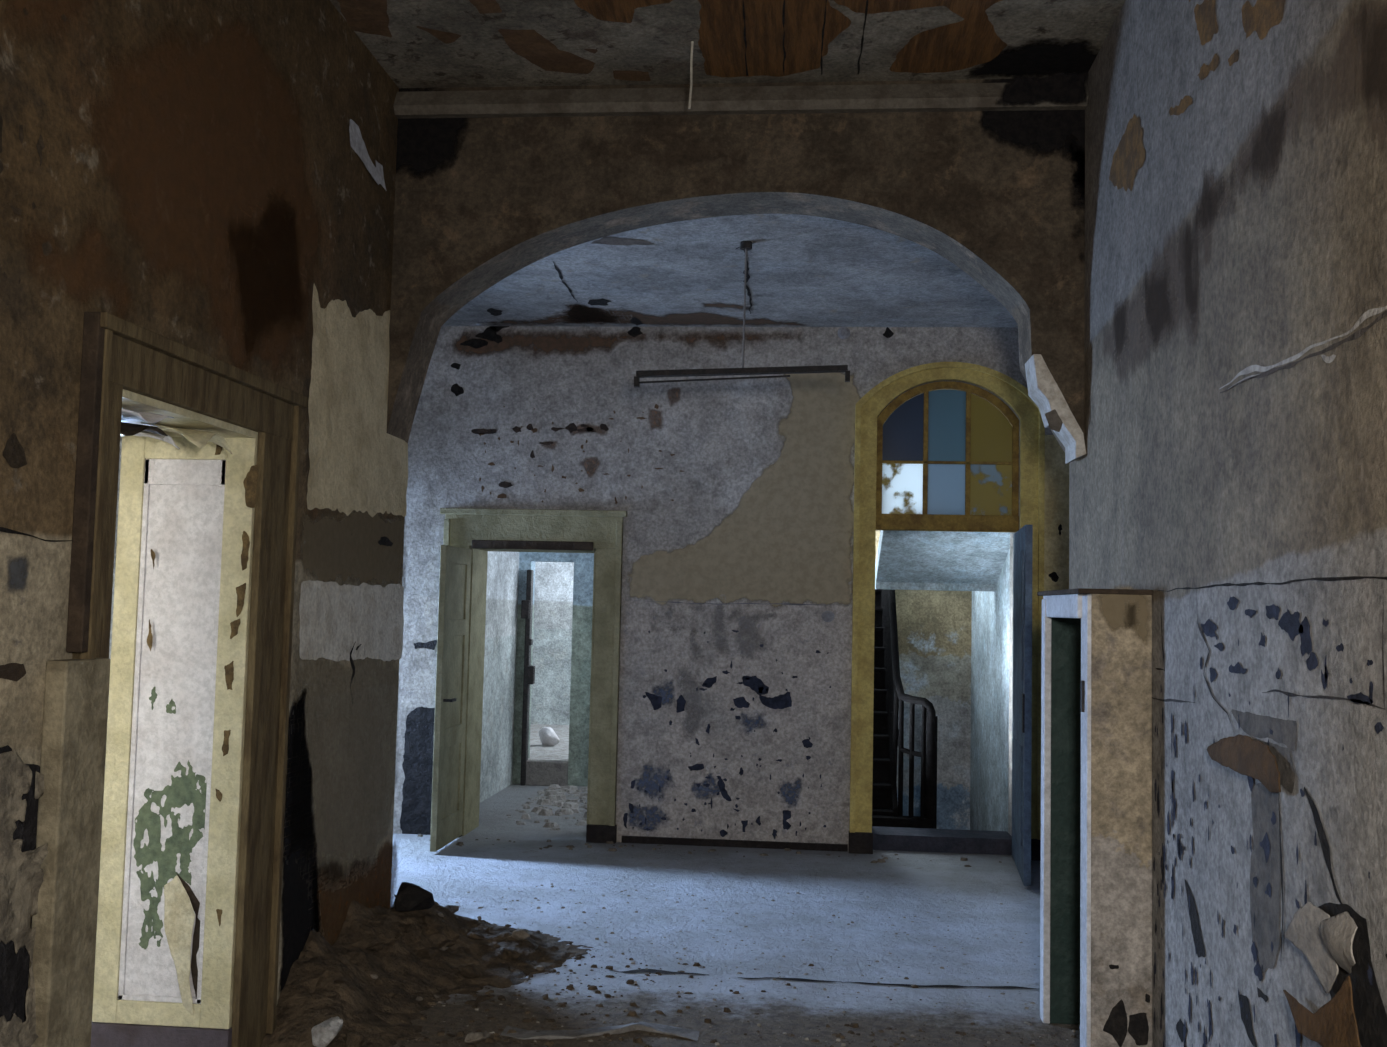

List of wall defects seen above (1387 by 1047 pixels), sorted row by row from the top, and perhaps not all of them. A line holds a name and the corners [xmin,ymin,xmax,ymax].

damp [1103,6,1387,377]
flaking render [307,284,408,517]
damp [450,298,805,396]
crack [0,527,72,542]
peeling [230,531,250,639]
flaking render [623,373,860,839]
crack [1152,576,1387,732]
peeling [1227,596,1344,689]
peeling [0,745,48,1047]
peeling [133,760,222,1015]
peeling [1103,709,1220,1047]
peeling [1207,668,1387,1047]